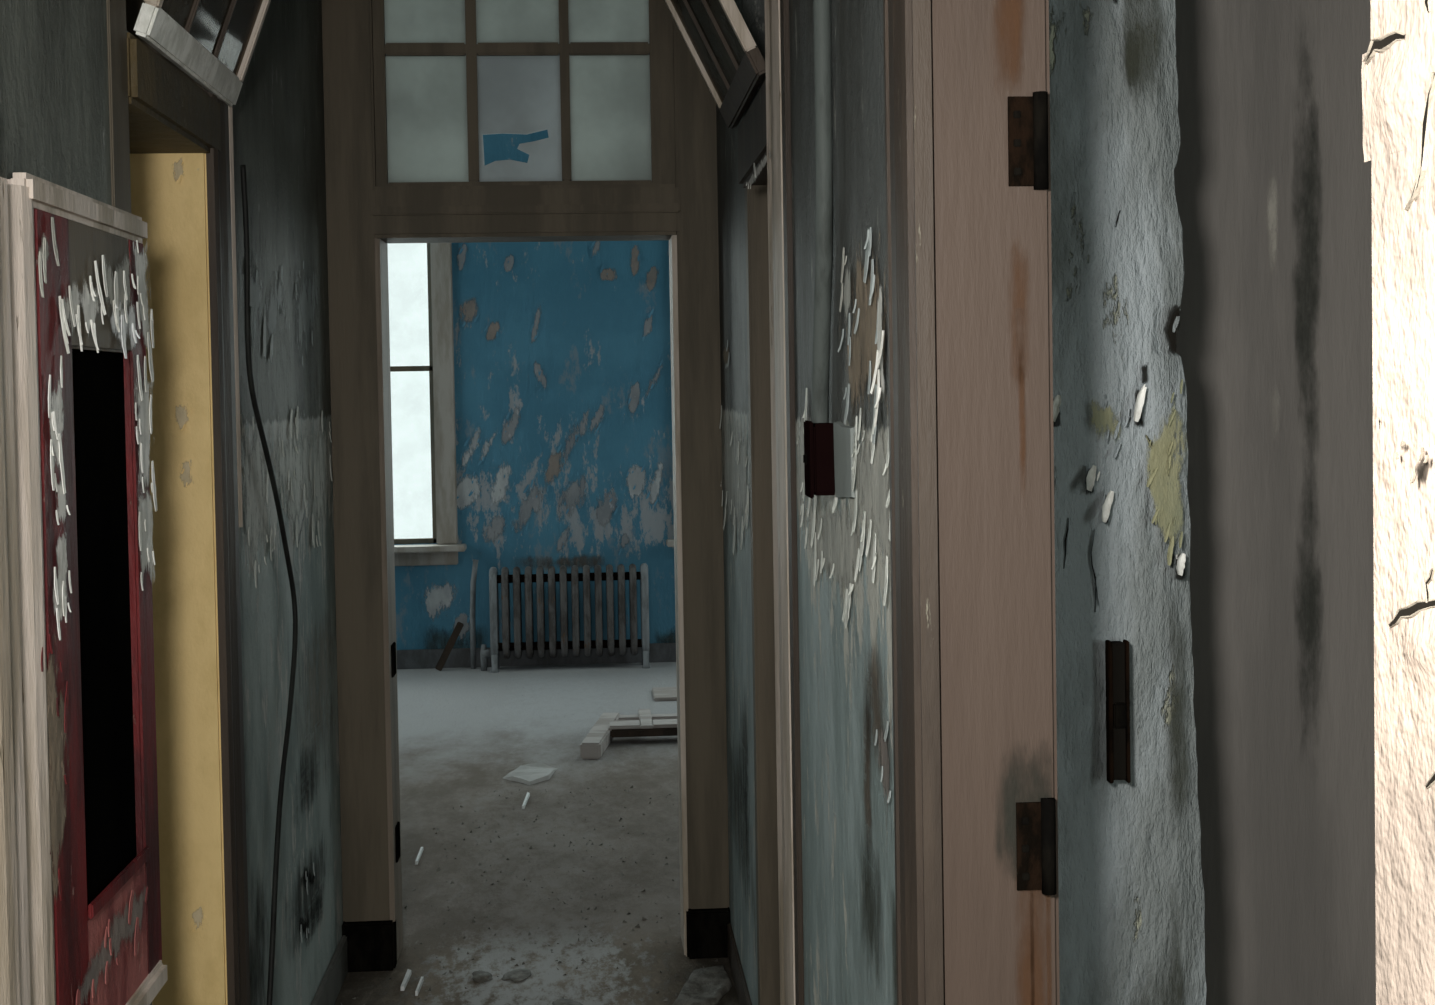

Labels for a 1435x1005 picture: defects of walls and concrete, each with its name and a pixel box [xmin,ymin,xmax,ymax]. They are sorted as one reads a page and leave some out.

crack [1362,0,1431,64]
crack [1404,72,1435,211]
peeling [460,298,500,340]
peeling [589,241,659,291]
spalling [1164,305,1181,354]
peeling [457,404,663,552]
peeling [797,227,891,628]
peeling [1085,465,1114,524]
peeling [1091,362,1186,580]
peeling [38,217,157,901]
crack [1388,568,1435,628]
rust [1021,893,1051,1005]